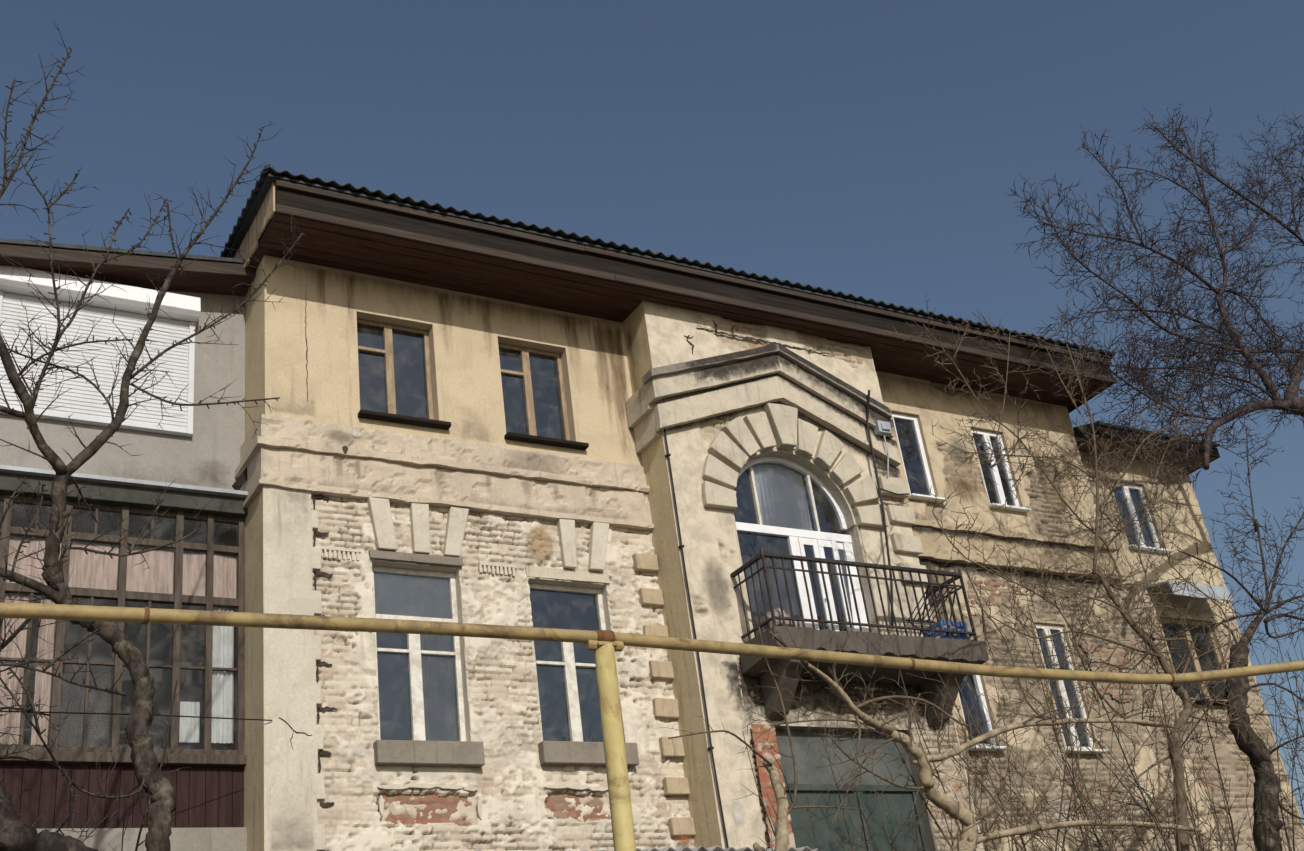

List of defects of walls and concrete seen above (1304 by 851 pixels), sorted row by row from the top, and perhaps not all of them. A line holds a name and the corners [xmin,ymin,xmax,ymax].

crack [684,320,836,356]
spalling [527,528,553,561]
damp [911,516,1101,552]
crack [279,717,311,748]
spalling [376,783,482,826]
spalling [544,783,609,822]